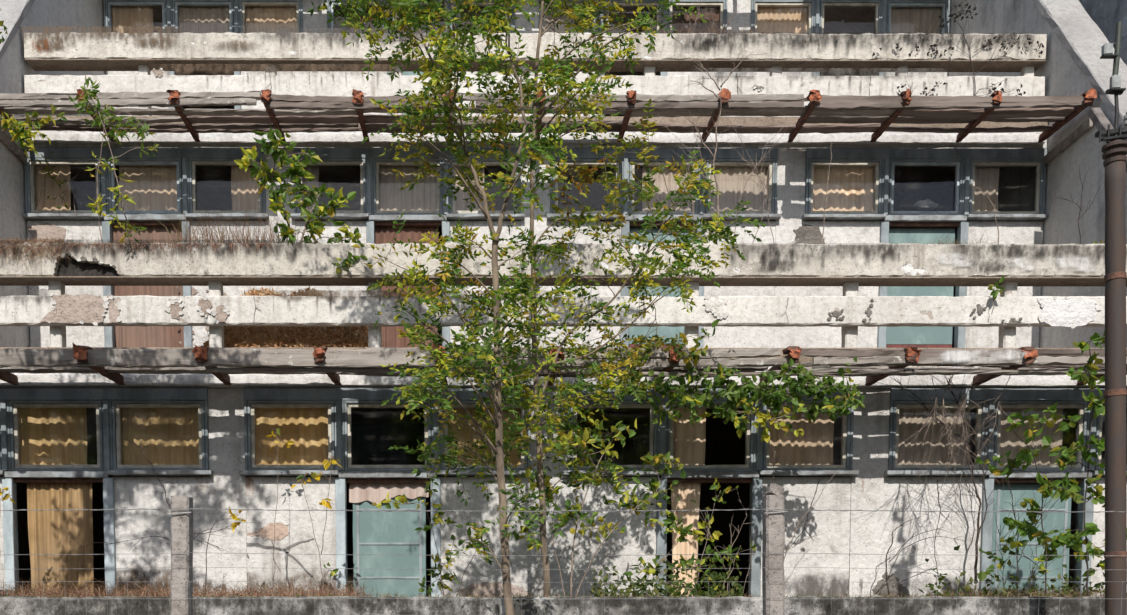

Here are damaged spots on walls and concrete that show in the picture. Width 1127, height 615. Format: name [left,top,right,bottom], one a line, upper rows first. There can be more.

damp [19,26,174,50]
damp [218,40,250,49]
damp [693,32,763,49]
damp [779,32,1031,47]
damp [168,64,396,82]
flaking render [791,224,826,244]
spalling [26,223,120,276]
mould [734,243,798,270]
mould [824,243,898,257]
damp [940,244,1105,271]
peeling [40,293,121,326]